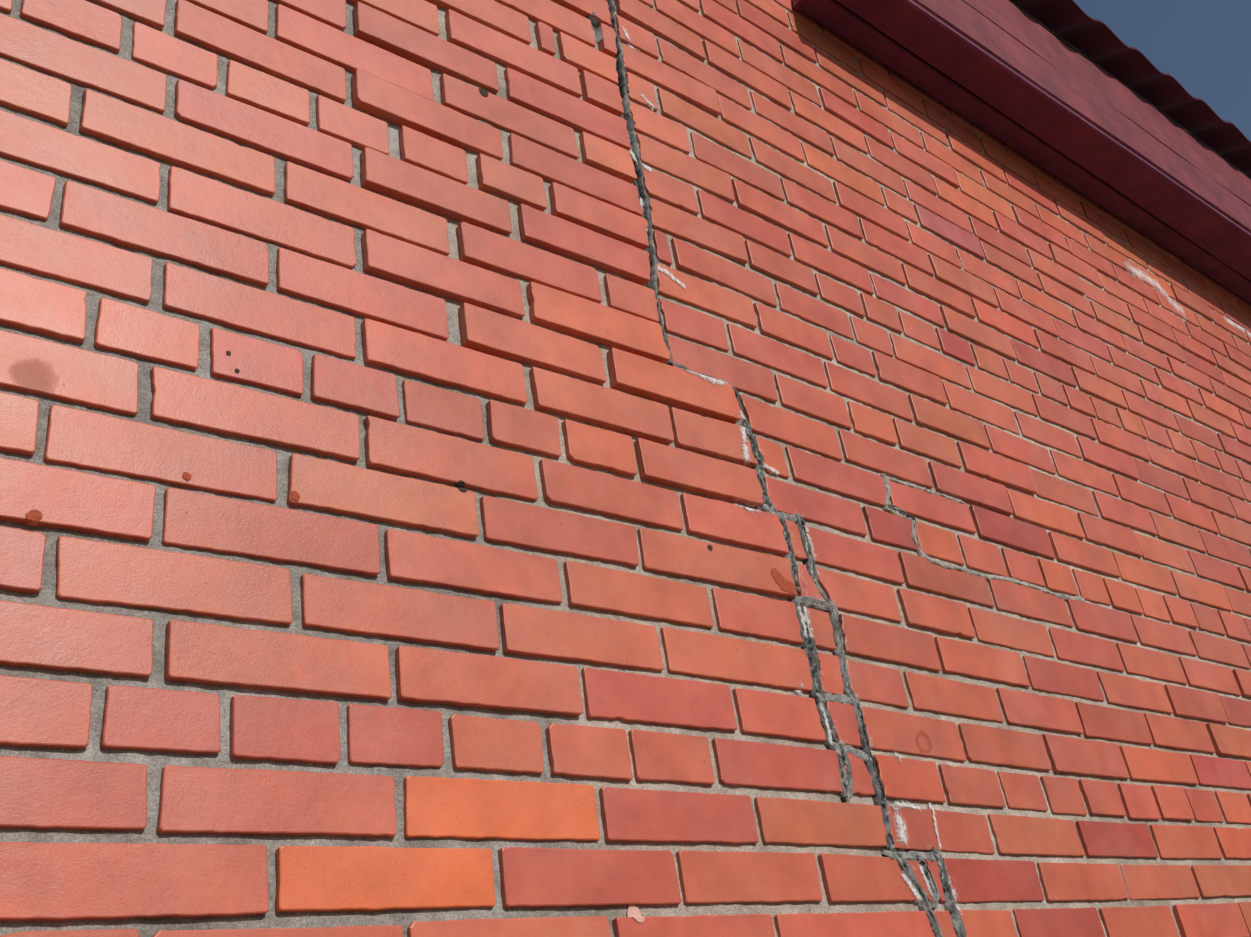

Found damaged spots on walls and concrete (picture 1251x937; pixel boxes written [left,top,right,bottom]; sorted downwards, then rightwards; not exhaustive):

crack [606,0,966,937]